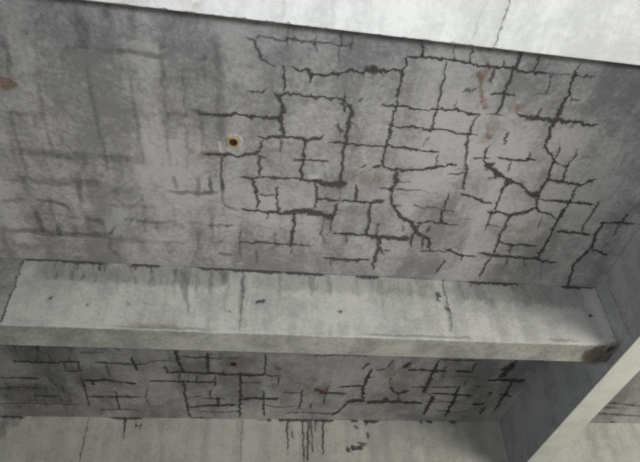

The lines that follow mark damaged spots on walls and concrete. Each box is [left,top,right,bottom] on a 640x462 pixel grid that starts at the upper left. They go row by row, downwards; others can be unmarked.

crack [198,37,633,290]
crack [2,349,526,424]
water stain [301,419,314,461]